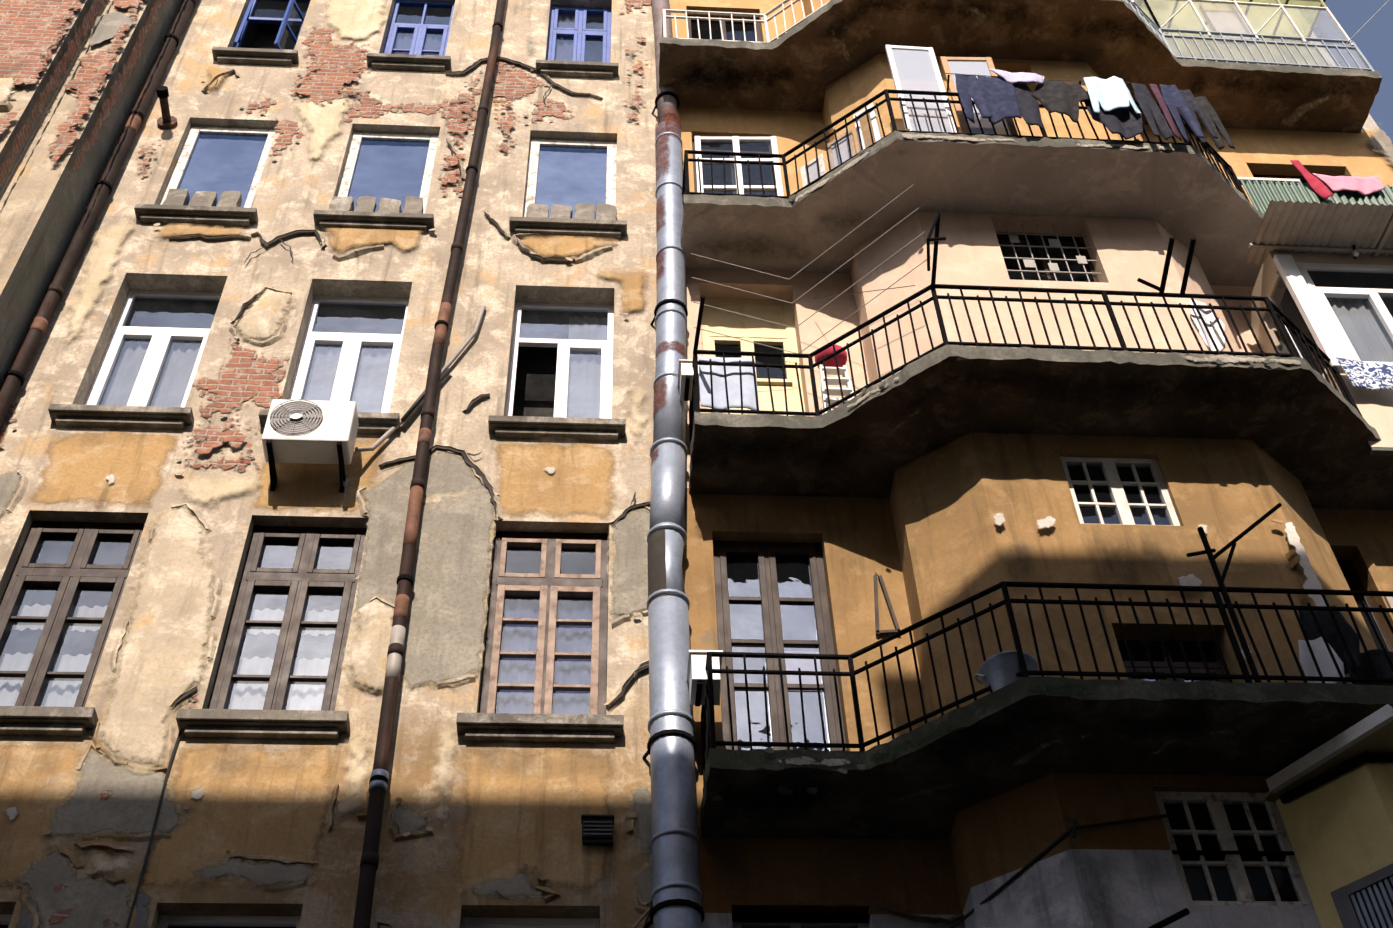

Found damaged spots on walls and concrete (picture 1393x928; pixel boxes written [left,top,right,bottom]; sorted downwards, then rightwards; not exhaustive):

flaking render [0,0,169,189]
flaking render [239,98,305,161]
flaking render [290,27,575,196]
crack [445,56,602,105]
crack [169,230,328,323]
crack [484,211,576,262]
flaking render [174,338,290,475]
peeling [355,451,499,690]
flaking render [1271,518,1326,606]
peeling [5,743,204,928]
peeling [193,850,318,893]